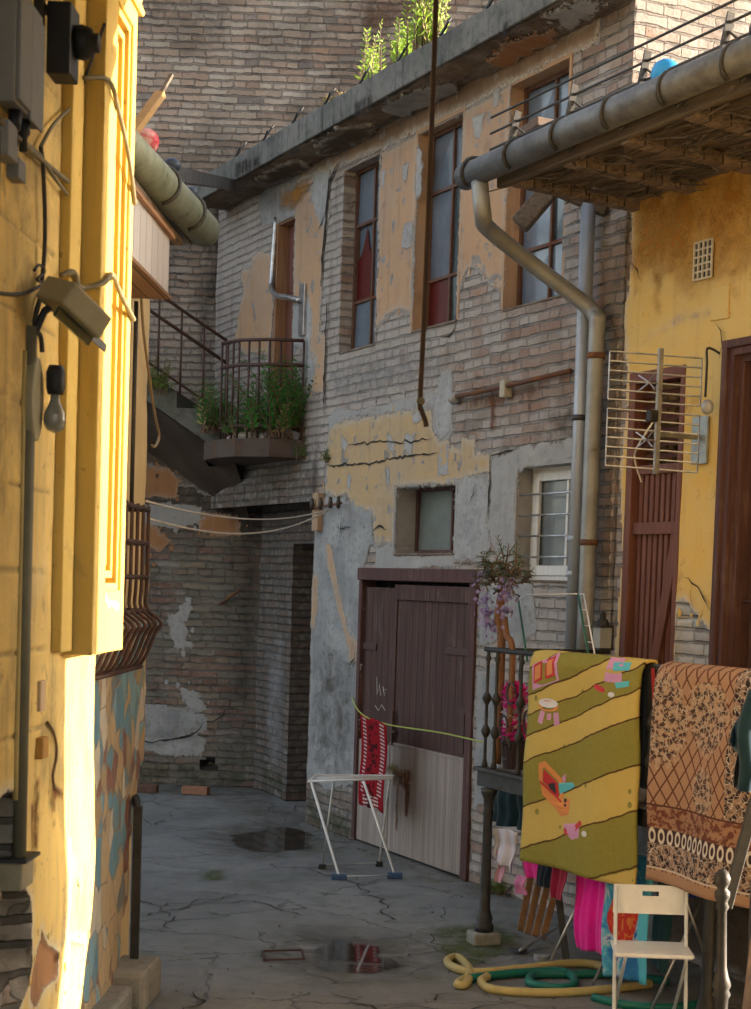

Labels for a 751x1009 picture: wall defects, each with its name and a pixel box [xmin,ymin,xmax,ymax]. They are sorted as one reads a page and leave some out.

peeling [254,0,612,397]
peeling [234,250,276,357]
crack [325,438,438,479]
peeling [143,452,249,604]
peeling [156,596,196,657]
peeling [306,368,572,809]
peeling [164,680,209,714]
peeling [144,732,218,771]
spalling [0,788,14,858]
peeling [638,826,647,853]
spalling [0,888,90,1009]
peeling [670,898,749,983]